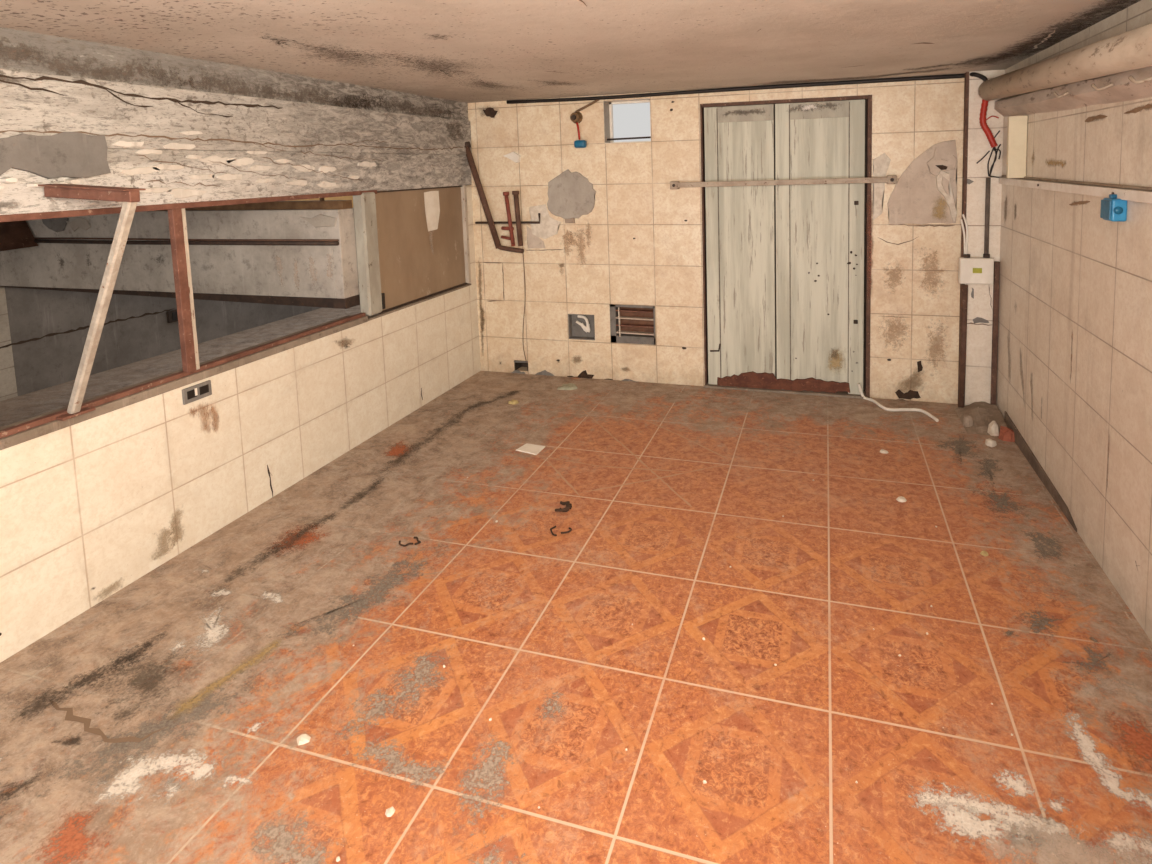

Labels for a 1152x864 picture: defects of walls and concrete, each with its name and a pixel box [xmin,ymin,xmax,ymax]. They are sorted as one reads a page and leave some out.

damp [0,43,452,118]
crack [0,74,463,151]
damp [263,38,514,90]
damp [772,0,1141,84]
spalling [0,131,383,198]